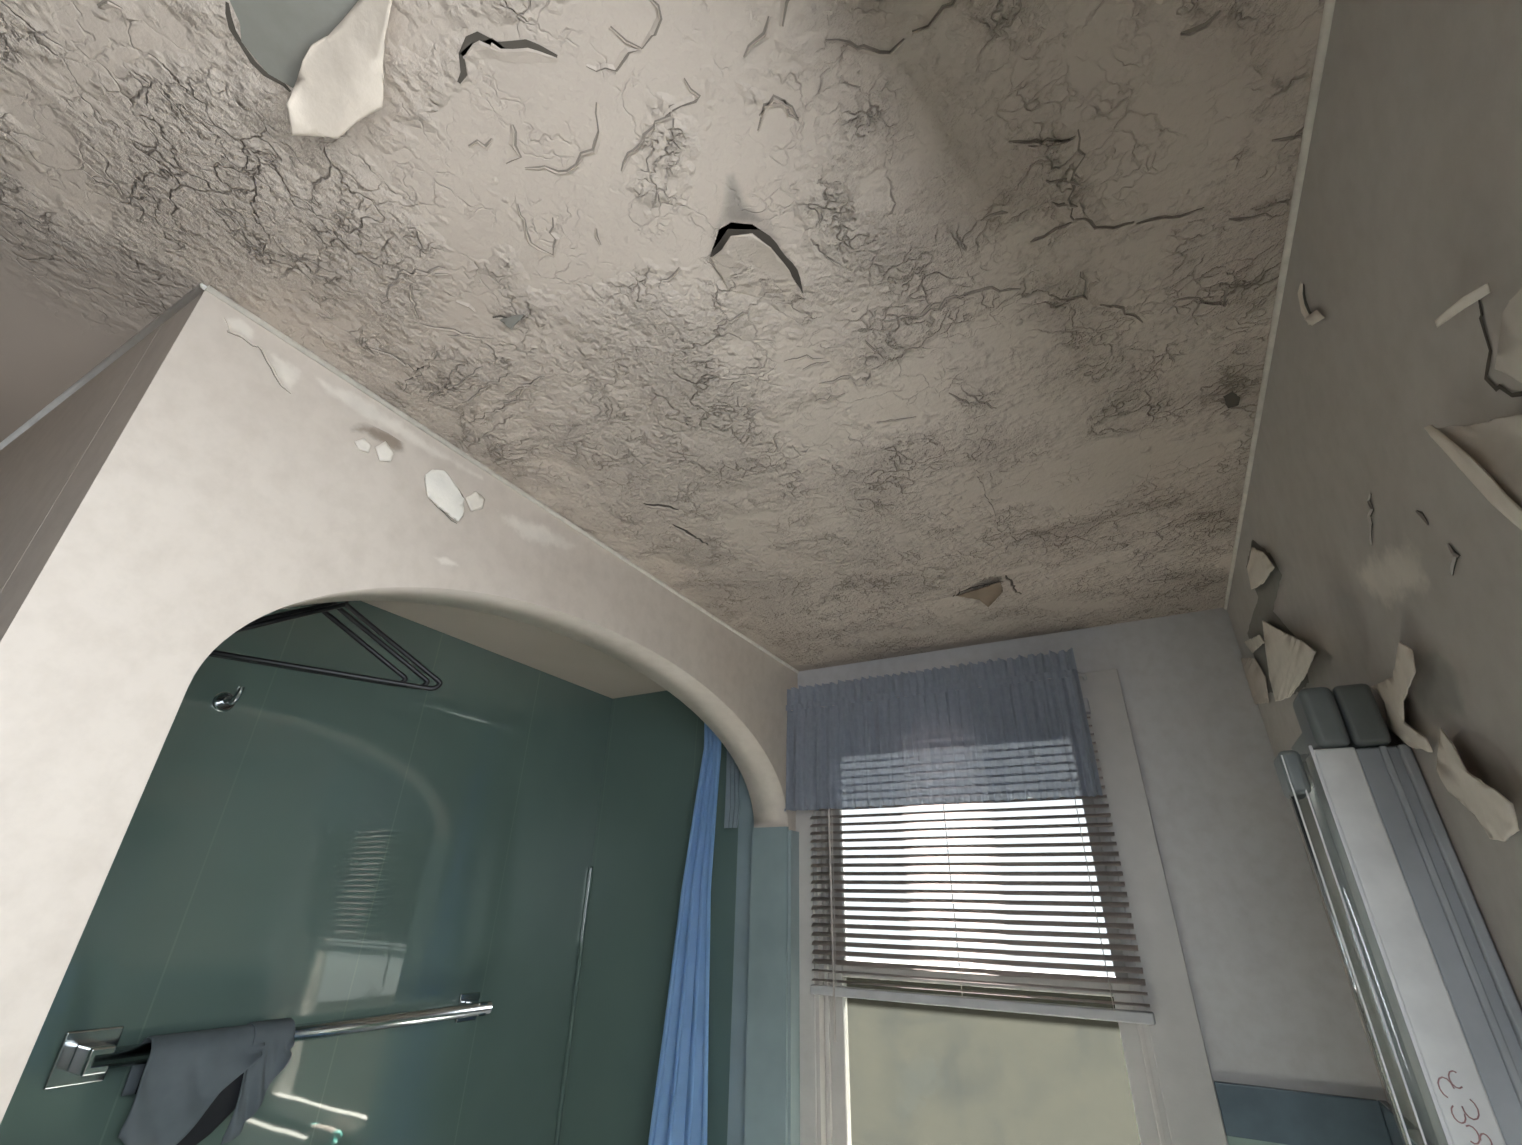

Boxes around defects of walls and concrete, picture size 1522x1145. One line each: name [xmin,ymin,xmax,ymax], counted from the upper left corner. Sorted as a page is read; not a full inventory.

peeling [225,0,392,139]
crack [457,0,701,258]
peeling [708,167,805,301]
crack [743,0,790,58]
crack [757,94,799,131]
crack [825,0,959,56]
crack [874,271,1230,323]
crack [981,129,1273,243]
peeling [1424,283,1522,530]
peeling [953,575,1021,607]
peeling [1241,540,1316,704]
peeling [1371,642,1522,842]